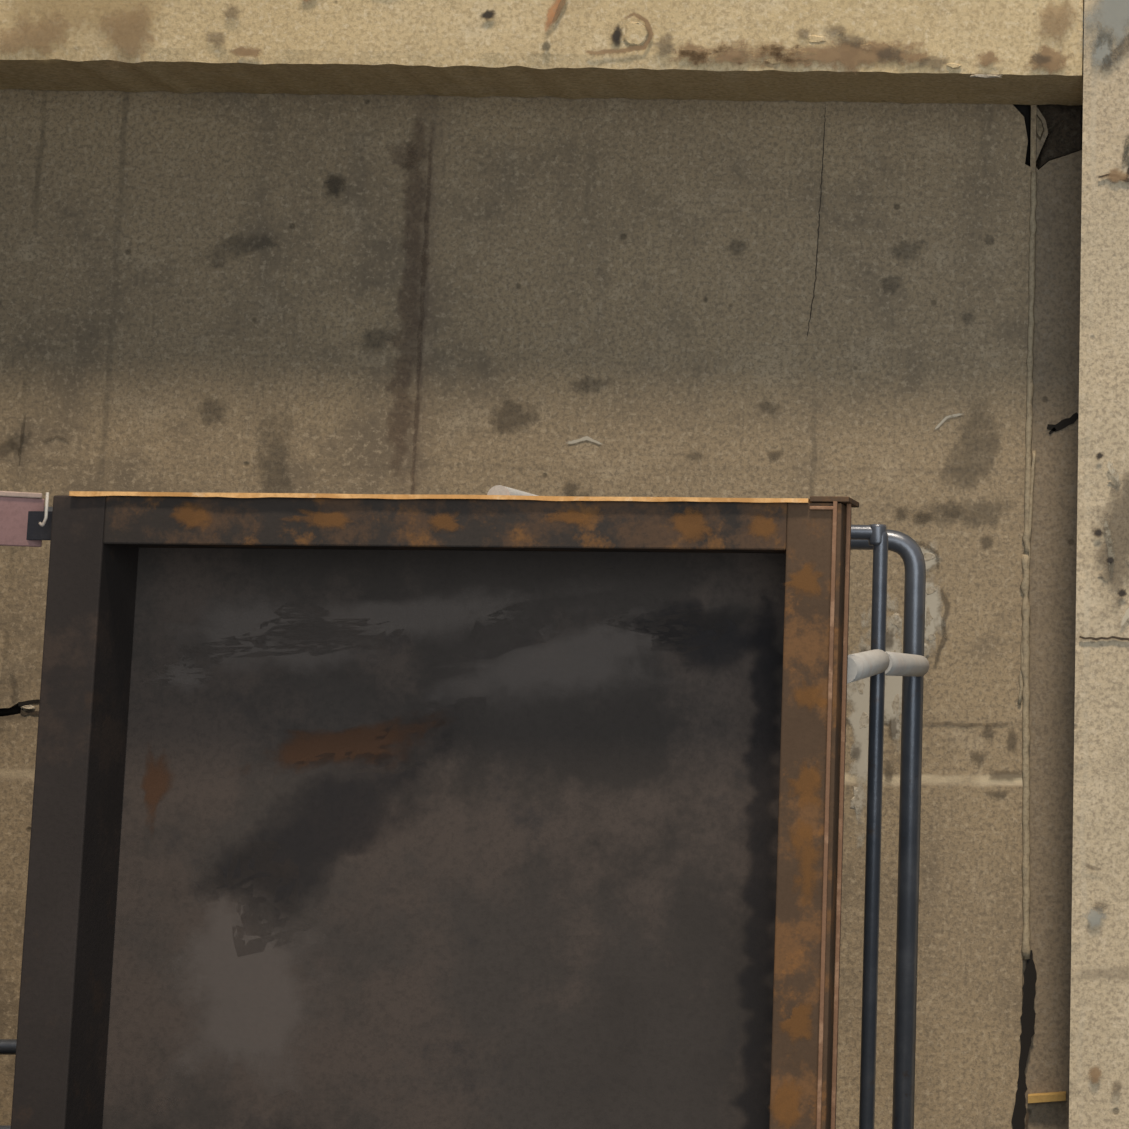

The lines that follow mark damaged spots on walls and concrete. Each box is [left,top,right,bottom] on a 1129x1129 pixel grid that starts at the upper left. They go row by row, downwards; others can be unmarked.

spalling [1094,519,1129,581]
spalling [1118,589,1129,626]
crack [1011,950,1037,1129]